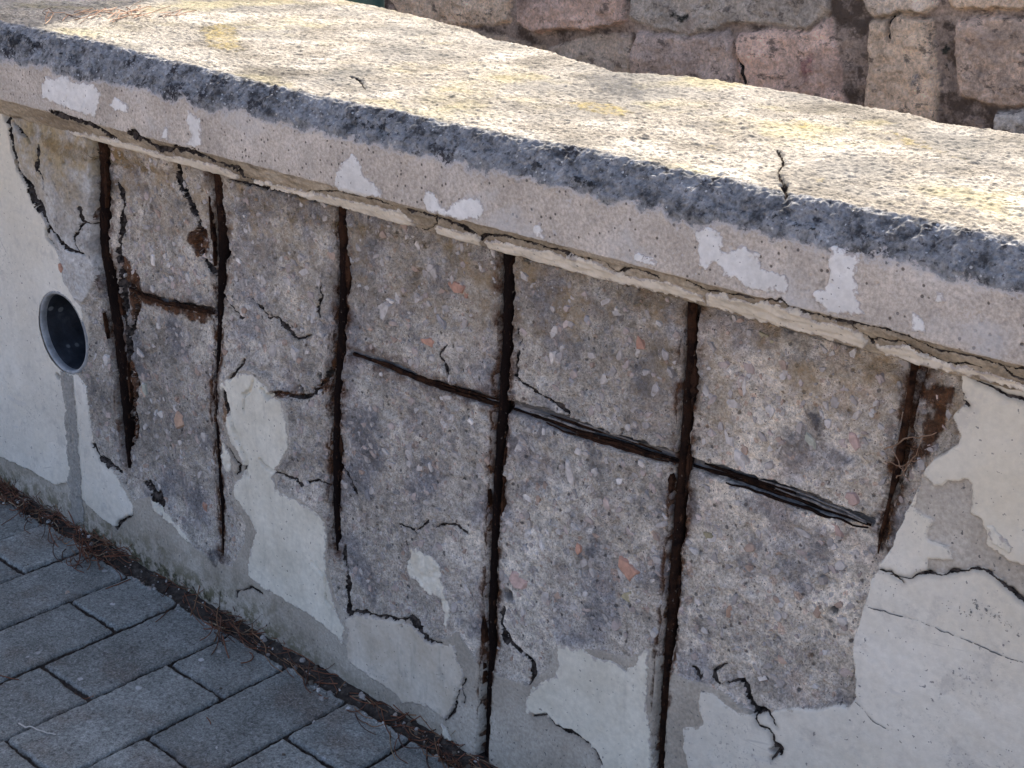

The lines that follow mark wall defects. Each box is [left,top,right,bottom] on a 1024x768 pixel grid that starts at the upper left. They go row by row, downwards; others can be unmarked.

peeling [186,110,202,148]
crack [776,150,788,200]
crack [50,110,660,340]
crack [6,117,140,446]
rust [122,255,215,334]
crack [223,358,246,414]
crack [514,328,571,415]
spalling [67,130,1024,768]
crack [686,279,1024,407]
rust [908,383,954,474]
crack [880,566,1024,602]
crack [692,663,784,760]